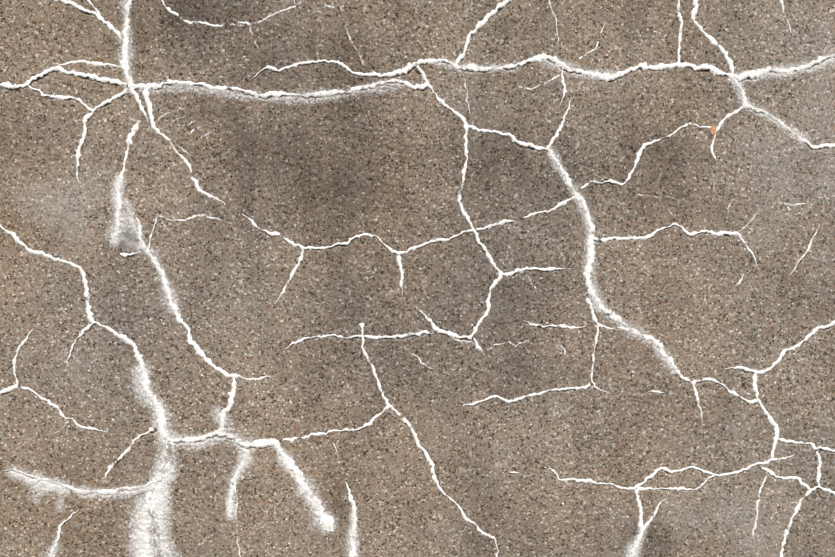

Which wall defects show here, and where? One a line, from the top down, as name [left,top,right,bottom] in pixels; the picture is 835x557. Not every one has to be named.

crack [0,0,835,196]
crack [116,120,141,223]
damp [109,175,179,313]
crack [0,216,334,532]
crack [262,194,571,443]
crack [463,298,614,406]
crack [523,193,835,557]
damp [9,362,252,557]
efflorescence [273,442,335,532]
damp [347,508,359,557]
crack [401,418,499,557]
efflorescence [626,527,646,557]